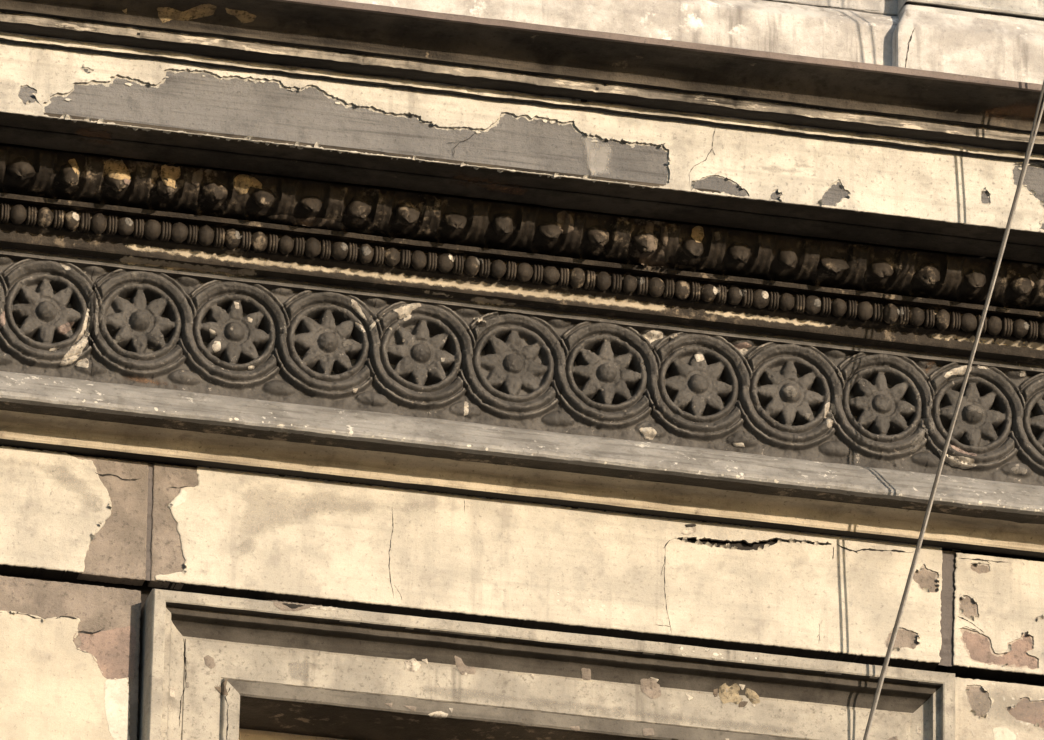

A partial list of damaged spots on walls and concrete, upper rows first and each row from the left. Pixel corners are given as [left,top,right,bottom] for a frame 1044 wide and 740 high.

peeling [157,4,256,23]
peeling [17,66,671,188]
peeling [691,175,749,197]
peeling [818,180,851,207]
peeling [1010,164,1044,229]
peeling [0,454,198,740]
crack [659,538,676,633]
peeling [913,564,940,593]
peeling [884,627,920,651]
peeling [959,595,1044,670]
spalling [713,683,760,707]
peeling [965,685,1044,740]